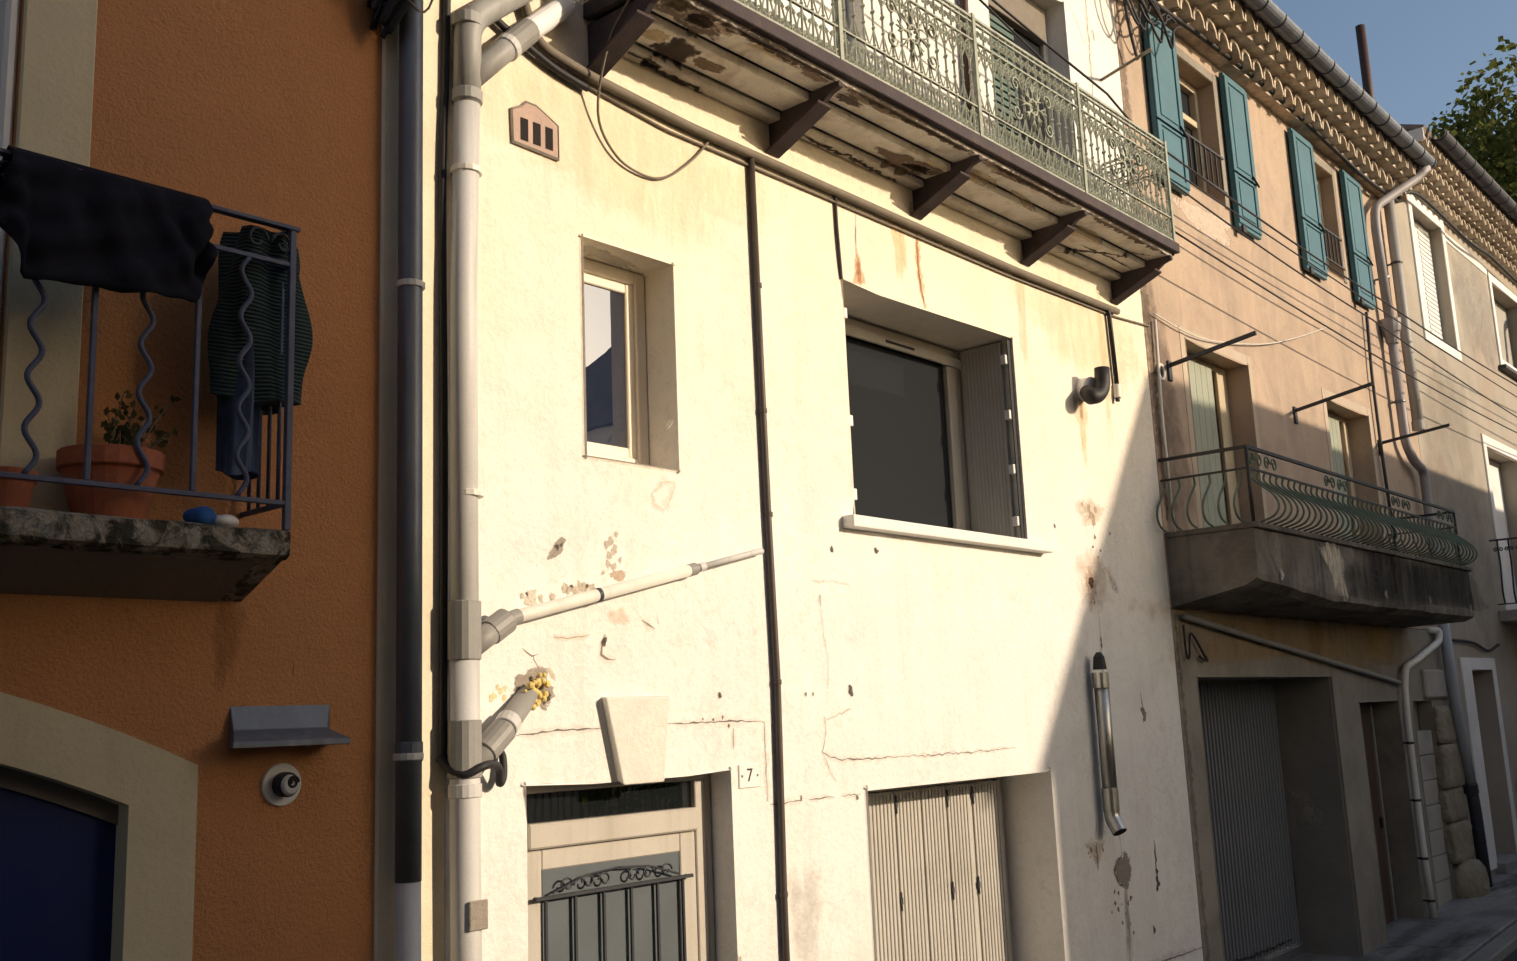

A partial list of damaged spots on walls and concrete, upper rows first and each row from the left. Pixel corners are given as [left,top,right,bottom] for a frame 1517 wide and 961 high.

peeling [520,532,625,605]
crack [668,580,1013,805]